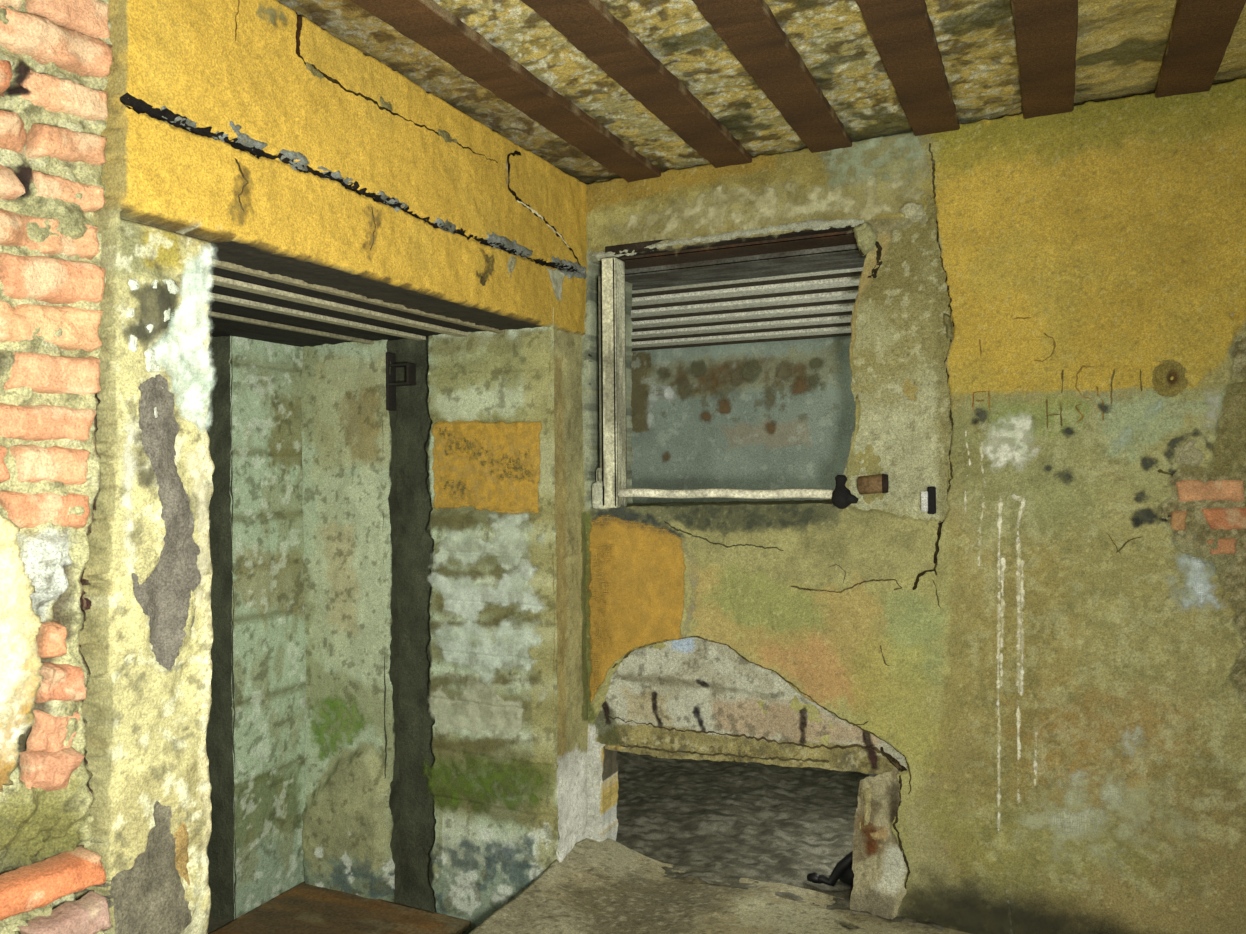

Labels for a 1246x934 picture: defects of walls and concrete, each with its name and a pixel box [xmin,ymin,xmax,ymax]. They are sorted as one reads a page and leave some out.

crack [233,0,241,41]
crack [120,12,586,279]
spalling [0,0,192,934]
peeling [122,247,214,671]
crack [664,521,784,551]
spalling [588,515,910,919]
crack [790,143,954,609]
leakage [978,494,1038,833]
leakage [1022,771,1161,854]
spalling [1132,330,1246,705]